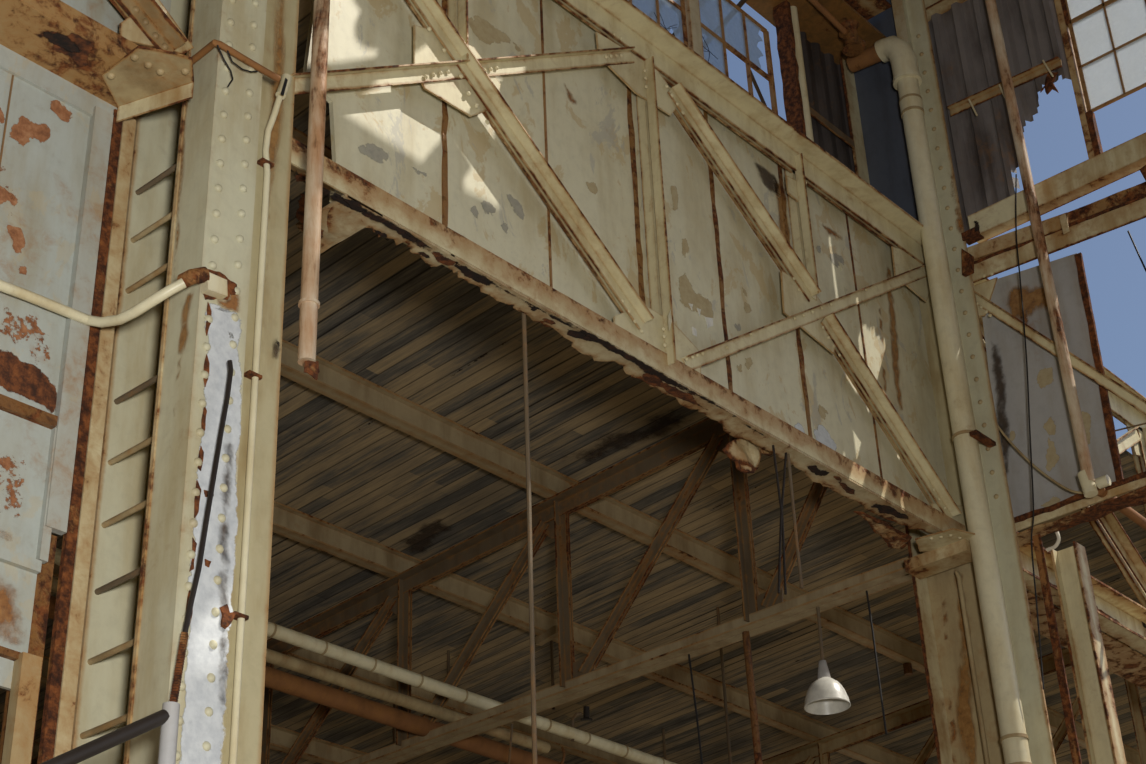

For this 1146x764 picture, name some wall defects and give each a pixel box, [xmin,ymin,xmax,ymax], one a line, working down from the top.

corrosion [43,31,94,66]
peeling [679,274,713,337]
corrosion [0,457,25,517]
peeling [179,303,242,764]
corrosion [0,586,16,637]